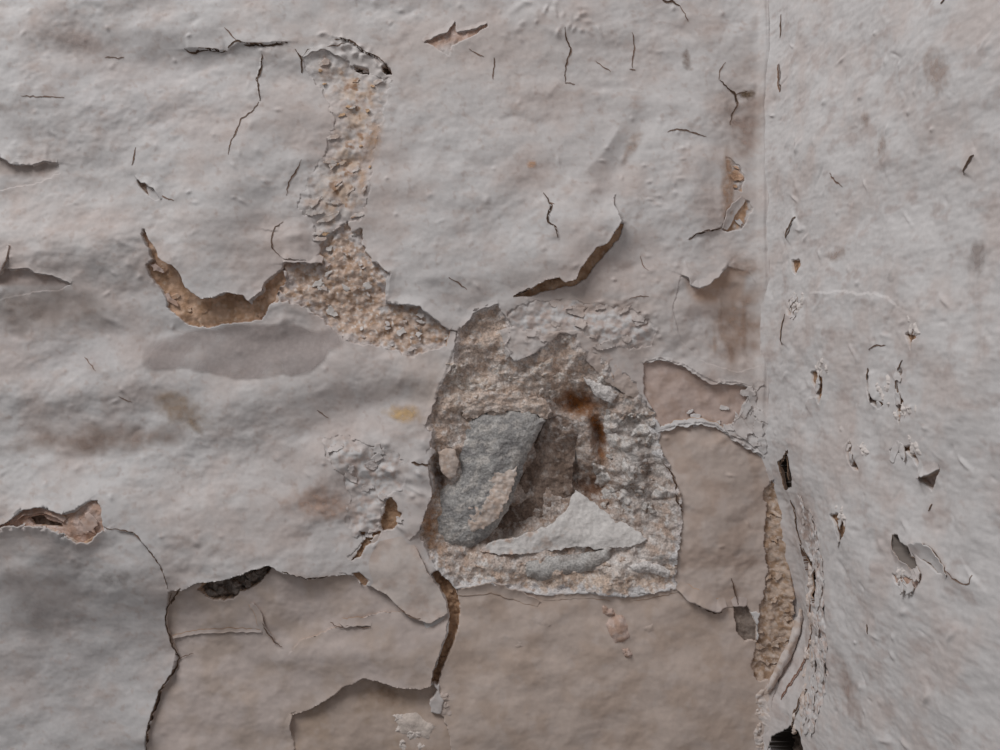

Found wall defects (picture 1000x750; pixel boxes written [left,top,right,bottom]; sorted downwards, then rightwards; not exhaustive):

crack [184,27,388,153]
crack [719,62,747,125]
crack [544,194,558,237]
peeling [0,245,72,300]
spalling [143,44,825,750]
corrosion [567,394,605,457]
flaking render [32,515,63,526]
peeling [889,535,947,595]
crack [105,527,194,750]
crack [432,571,460,682]